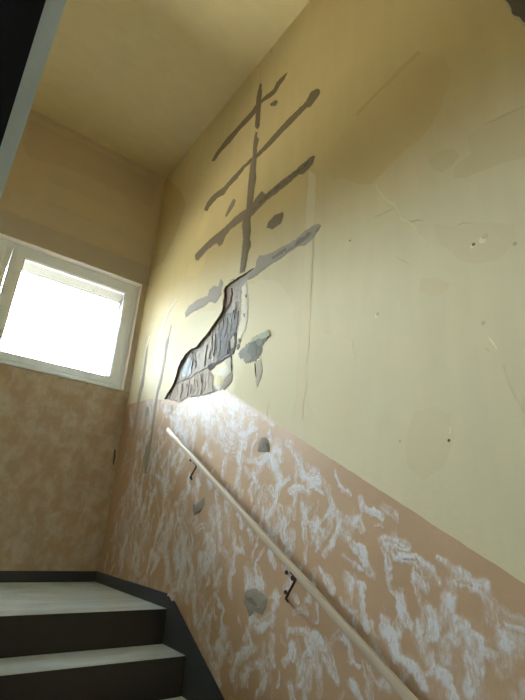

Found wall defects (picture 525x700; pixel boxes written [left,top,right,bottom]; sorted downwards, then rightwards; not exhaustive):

spalling [164,268,254,403]
water stain [406,406,454,480]